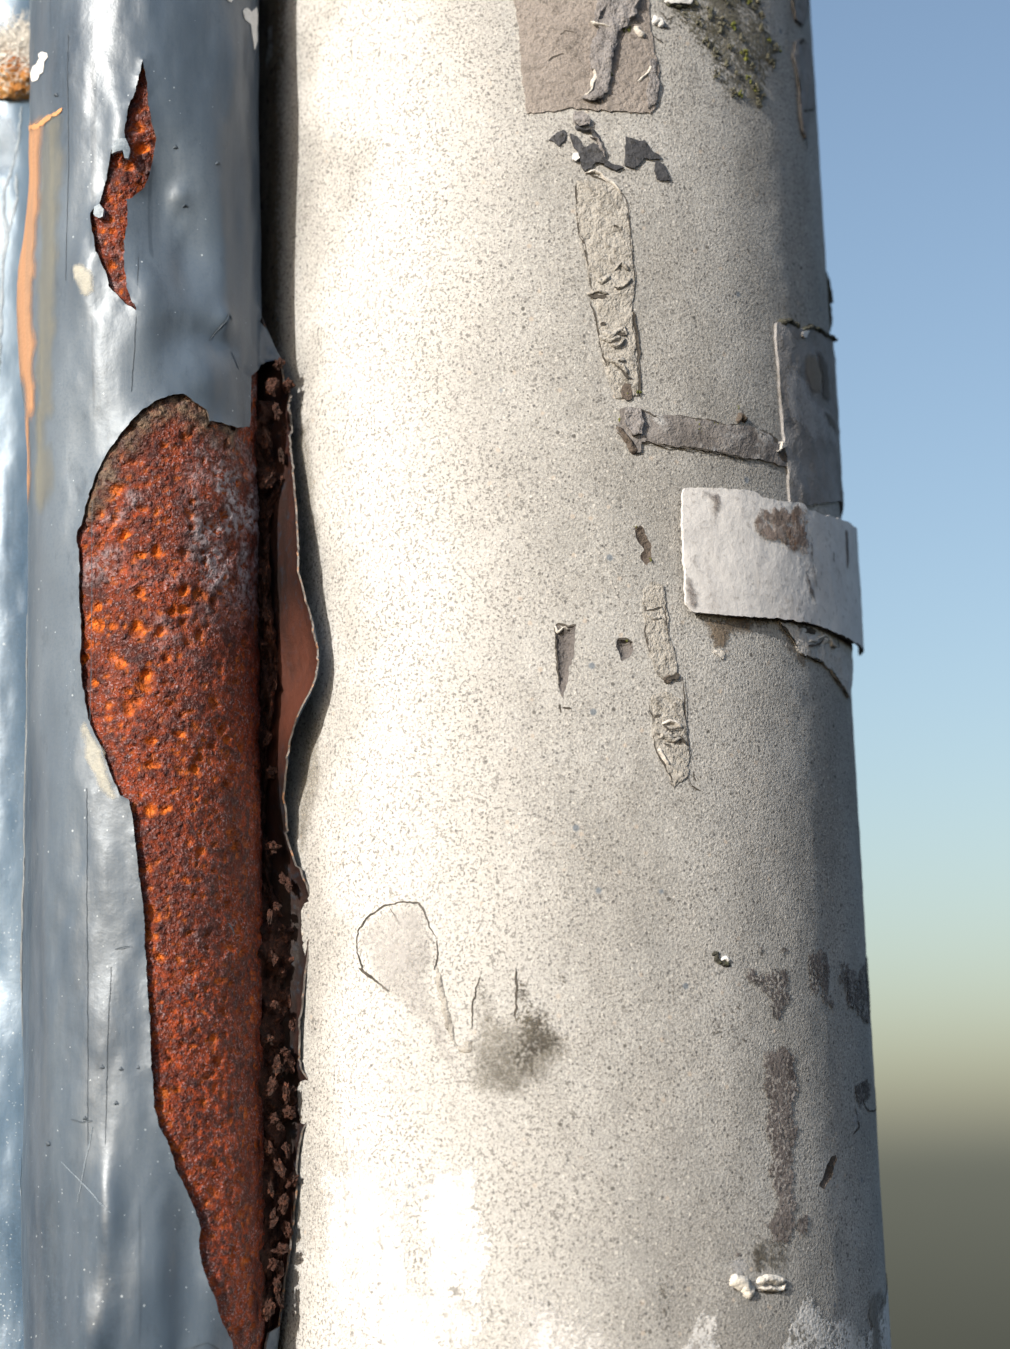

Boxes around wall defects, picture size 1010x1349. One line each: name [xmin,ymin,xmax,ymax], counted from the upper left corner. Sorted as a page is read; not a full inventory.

peeling [513,0,693,114]
peeling [790,0,816,146]
peeling [549,130,580,162]
peeling [624,137,671,181]
peeling [575,180,844,517]
corrosion [258,357,296,490]
peeling [777,620,853,698]
corrosion [264,840,282,856]
corrosion [267,872,292,925]
corrosion [267,947,286,978]
corrosion [270,1000,296,1031]
corrosion [261,1034,299,1322]